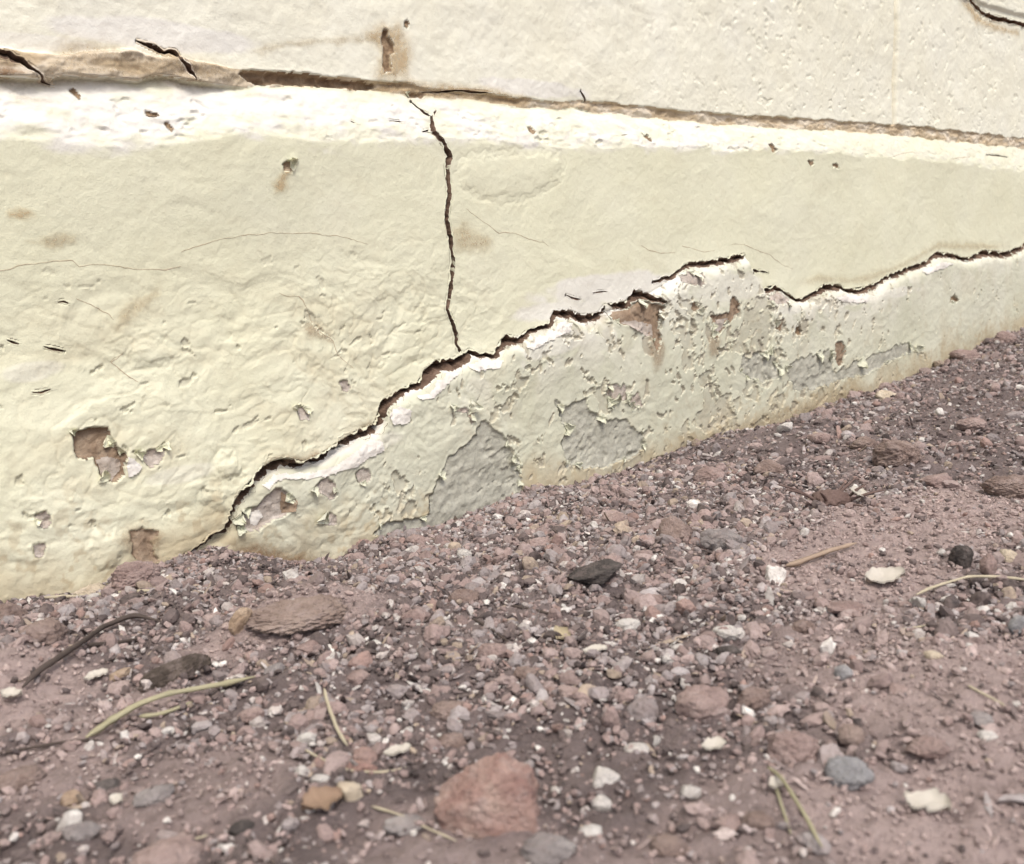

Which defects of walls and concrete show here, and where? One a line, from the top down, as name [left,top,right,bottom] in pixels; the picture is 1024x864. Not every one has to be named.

crack [967,0,1024,29]
crack [0,49,55,88]
crack [135,38,197,79]
spalling [283,157,299,172]
crack [185,88,1024,554]
peeling [691,297,740,338]
peeling [739,341,925,391]
spalling [555,384,648,469]
spalling [69,427,172,483]
spalling [374,399,525,536]
peeling [232,488,298,536]
peeling [130,528,160,563]